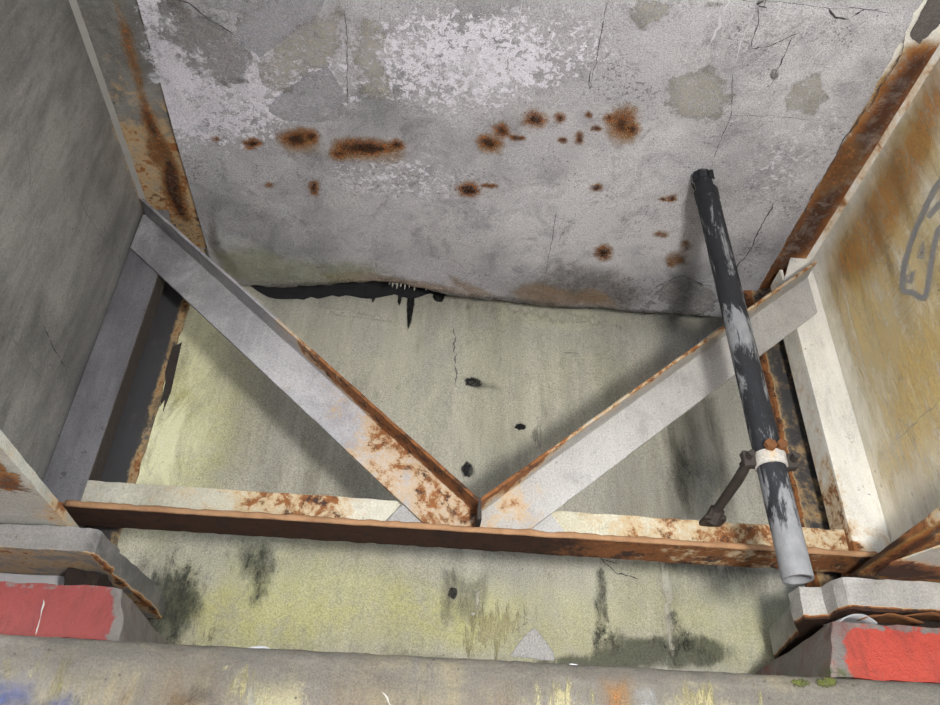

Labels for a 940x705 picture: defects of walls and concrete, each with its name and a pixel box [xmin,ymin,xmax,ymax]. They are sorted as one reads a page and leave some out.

crack [161,0,235,36]
crack [588,2,608,86]
crack [707,0,893,167]
corrosion [120,17,190,221]
corrosion [331,139,404,160]
crack [764,33,907,283]
corrosion [759,42,939,290]
crack [737,204,773,267]
leakage [363,281,496,329]
leakage [509,270,690,324]
corrosion [64,500,775,552]
corrosion [807,522,940,582]